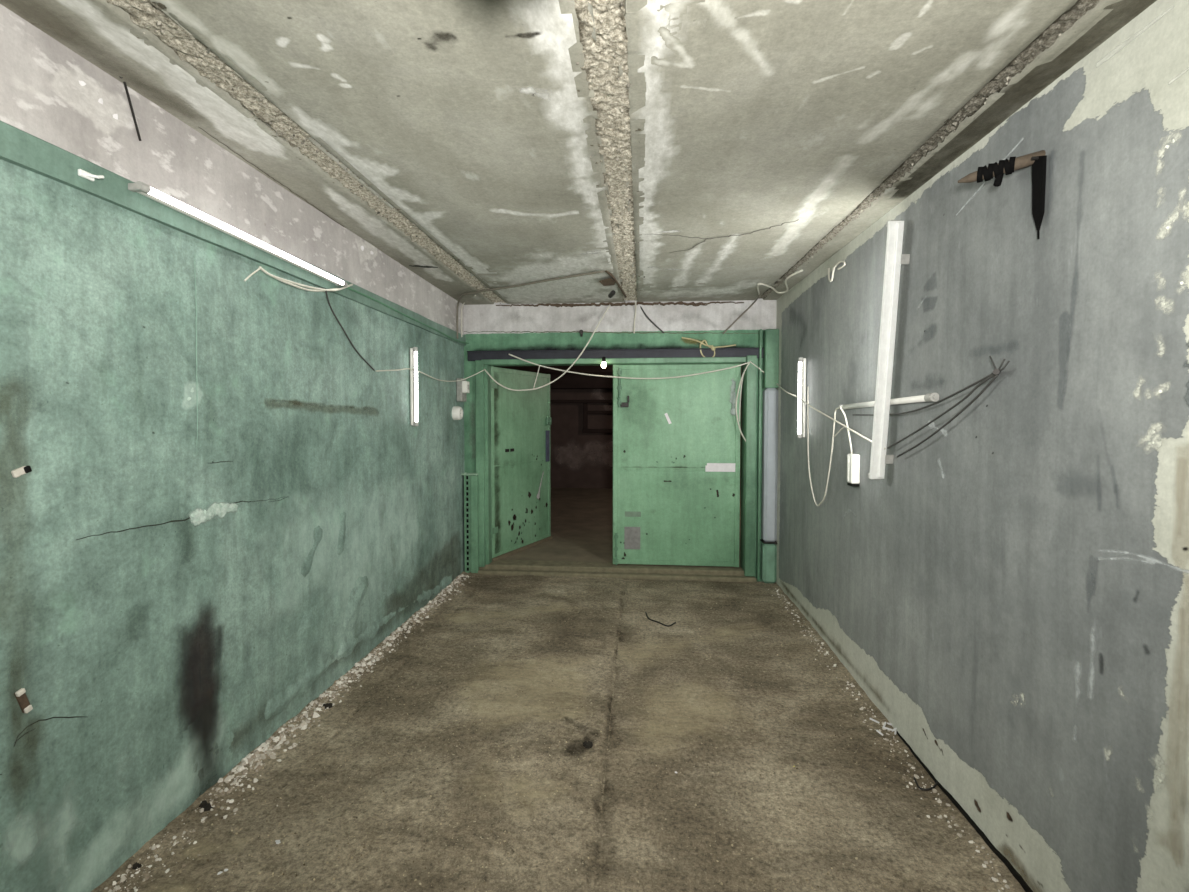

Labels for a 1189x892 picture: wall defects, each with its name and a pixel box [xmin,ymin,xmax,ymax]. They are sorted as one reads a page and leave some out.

spalling [106,0,506,304]
spalling [574,0,645,301]
peeling [1154,271,1189,312]
peeling [1134,380,1169,399]
peeling [1140,423,1163,451]
spalling [189,503,238,525]
crack [76,517,190,540]